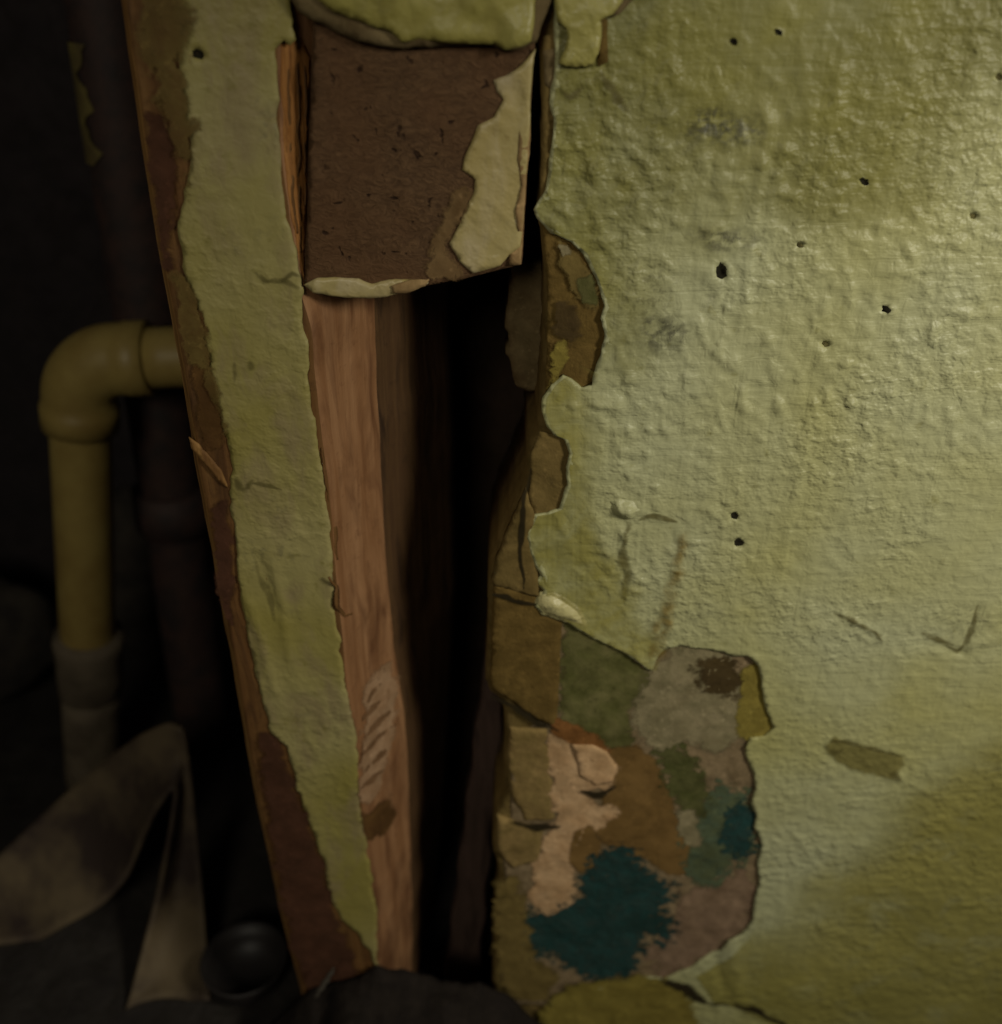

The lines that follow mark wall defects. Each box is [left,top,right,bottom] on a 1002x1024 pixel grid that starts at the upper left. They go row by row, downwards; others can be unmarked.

peeling [136,0,201,195]
spalling [292,0,632,392]
peeling [167,270,229,487]
peeling [210,500,236,626]
peeling [489,431,773,1024]
peeling [827,737,903,781]